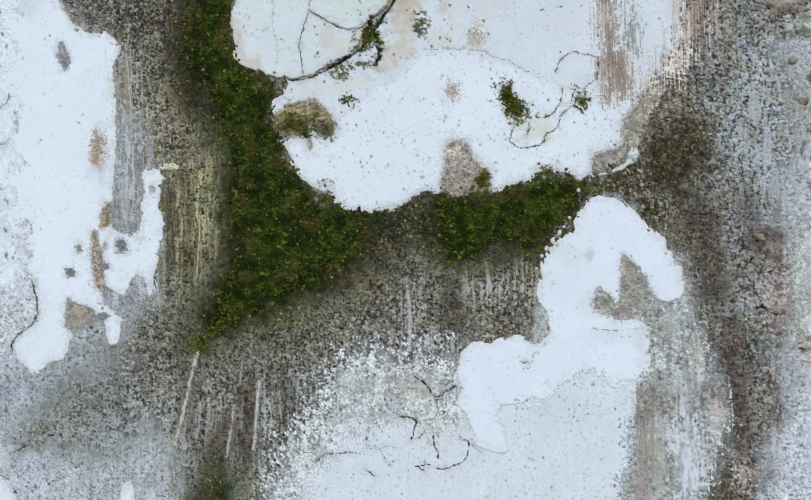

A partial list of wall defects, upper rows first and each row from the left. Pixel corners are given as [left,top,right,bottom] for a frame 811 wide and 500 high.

crack [283,0,395,81]
peeling [271,0,690,214]
spalling [764,0,811,40]
peeling [0,449,18,500]
peeling [0,0,179,375]
peeling [118,481,135,500]
water stain [2,0,553,500]
crack [303,376,470,470]
peeling [242,188,742,500]
water stain [554,0,811,500]
spalling [752,207,811,367]